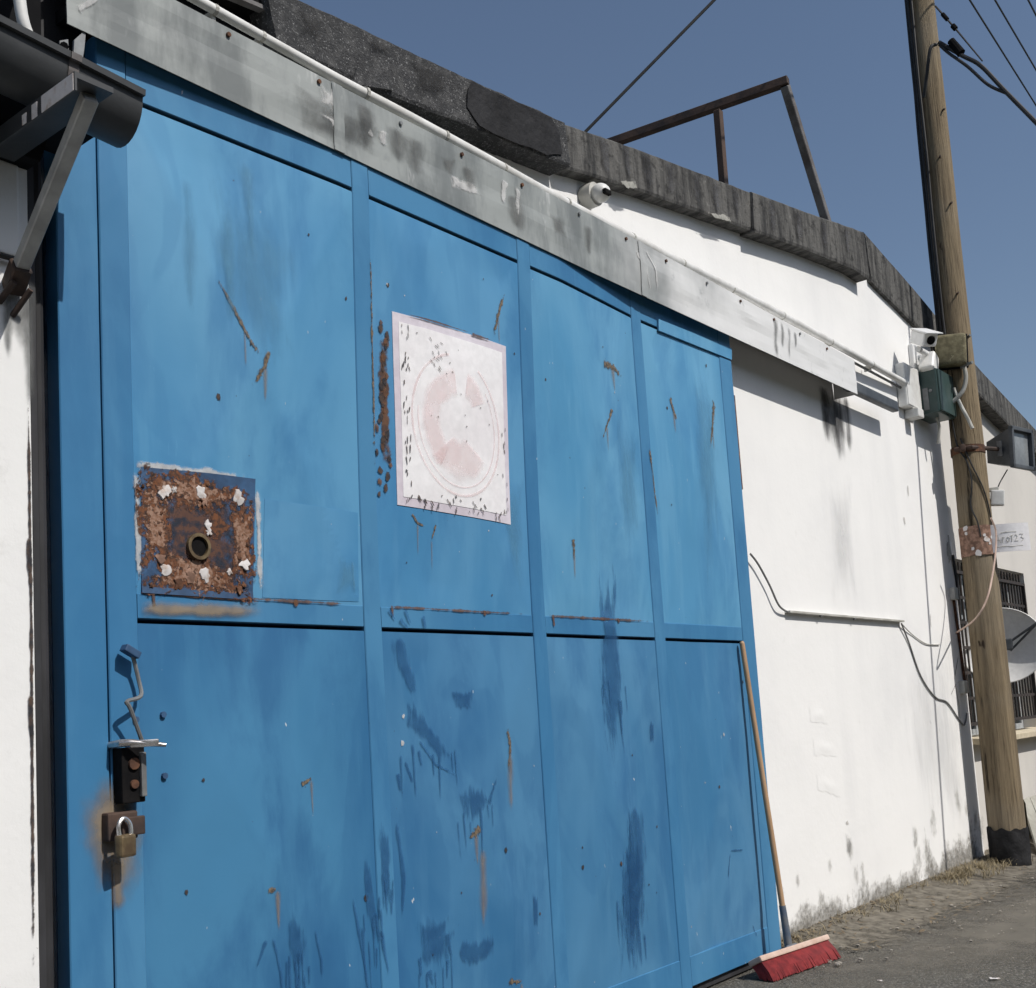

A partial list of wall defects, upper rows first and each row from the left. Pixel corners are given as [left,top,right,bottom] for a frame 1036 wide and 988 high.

rust [219,281,271,382]
rust [370,262,392,496]
water stain [822,390,850,449]
rust [133,462,340,615]
rust [391,606,510,616]
rust [552,615,641,626]
rust [93,795,129,905]
water stain [858,837,977,907]
water stain [780,903,845,941]